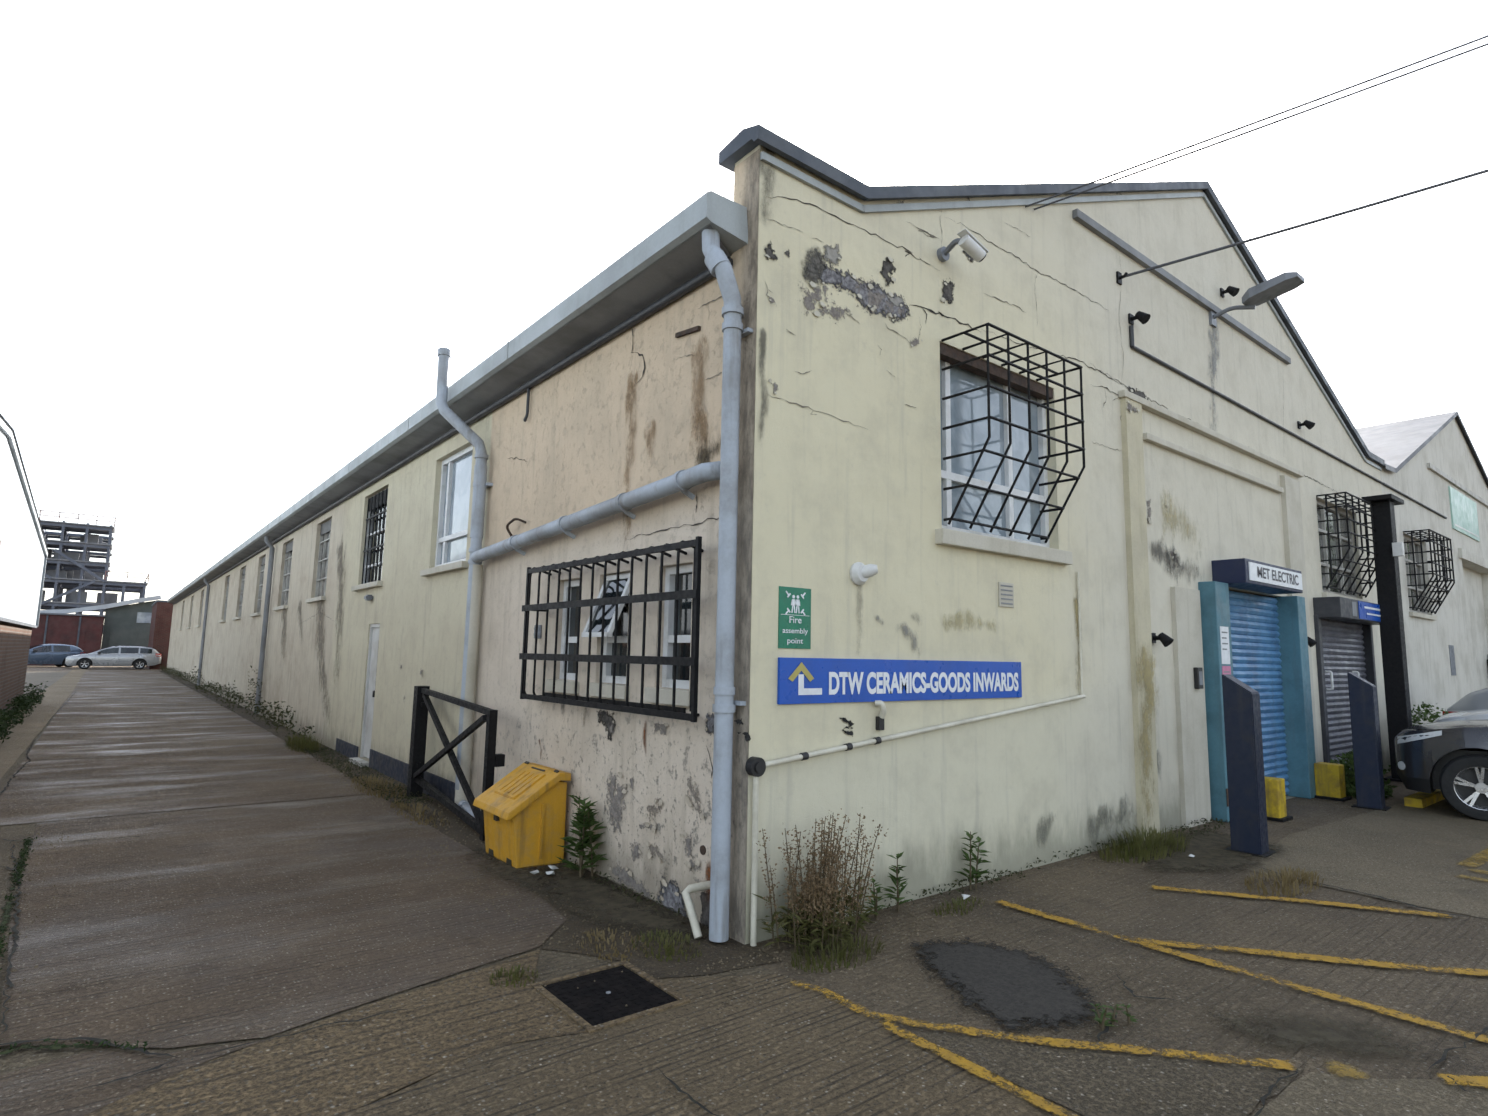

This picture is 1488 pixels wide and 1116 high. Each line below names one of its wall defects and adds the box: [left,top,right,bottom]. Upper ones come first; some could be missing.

flaking render [799,244,911,324]
water stain [625,375,655,481]
water stain [692,341,719,464]
water stain [282,542,343,709]
peeling [651,722,669,735]
flaking render [705,713,714,735]
peeling [602,772,705,917]
crack [1429,1027,1488,1068]